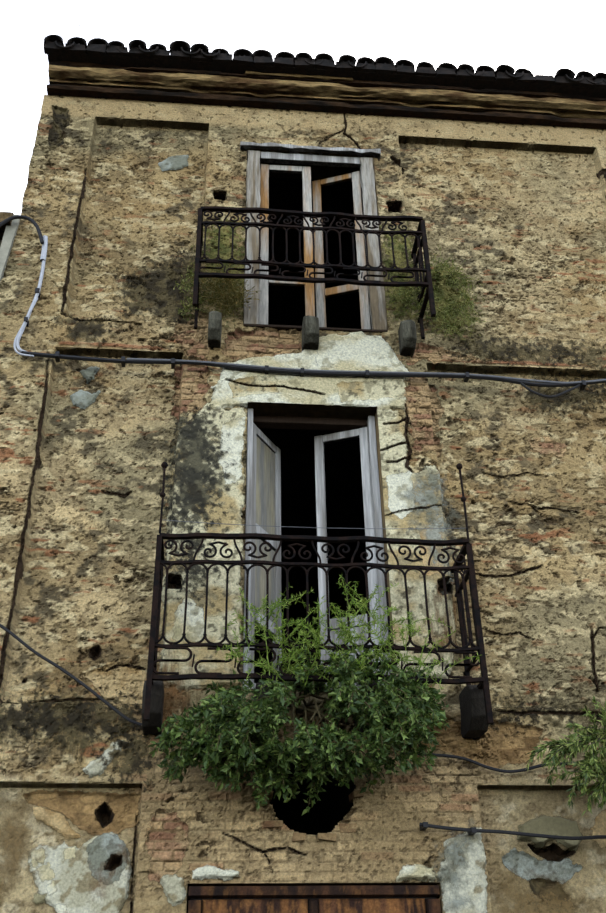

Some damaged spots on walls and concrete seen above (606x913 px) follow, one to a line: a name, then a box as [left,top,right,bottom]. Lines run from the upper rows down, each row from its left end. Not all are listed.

crack [319,114,361,149]
crack [229,380,323,394]
crack [382,407,412,472]
water stain [150,404,244,611]
flaking render [158,312,494,694]
spalling [82,740,124,778]
flaking render [23,789,239,913]
flaking render [396,827,488,913]
spalling [502,843,583,899]